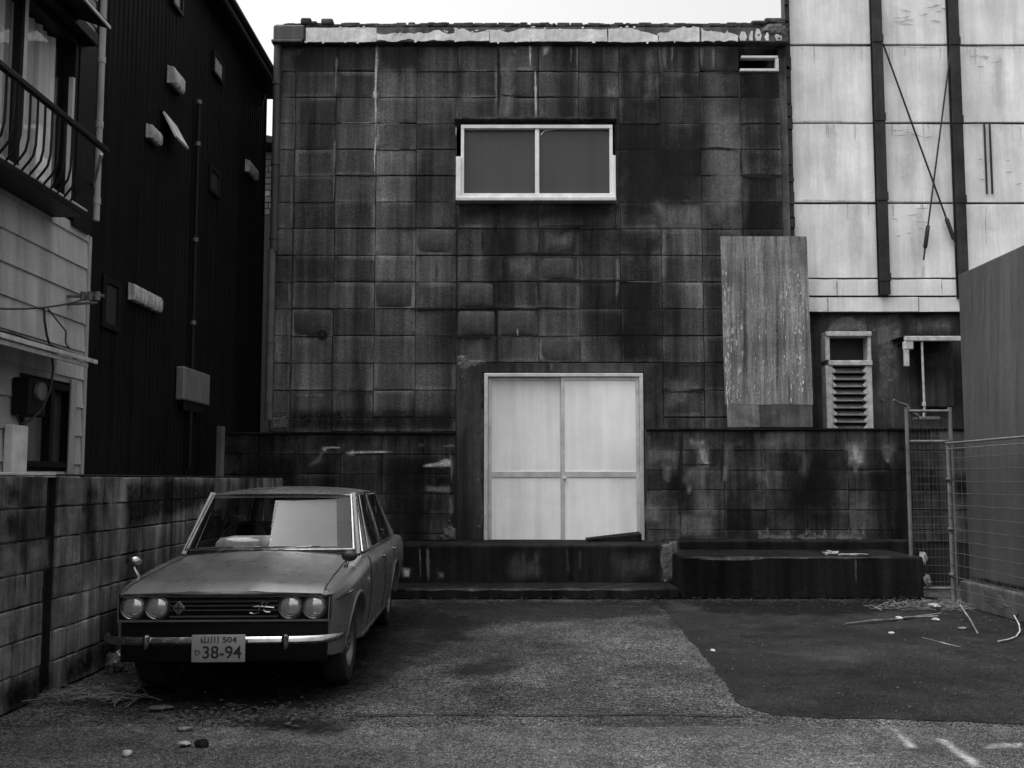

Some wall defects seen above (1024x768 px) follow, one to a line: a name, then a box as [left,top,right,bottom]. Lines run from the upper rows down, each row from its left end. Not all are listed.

water stain [363,48,425,123]
peeling [304,24,786,44]
water stain [619,118,739,225]
peeling [722,269,805,407]
water stain [66,481,214,590]